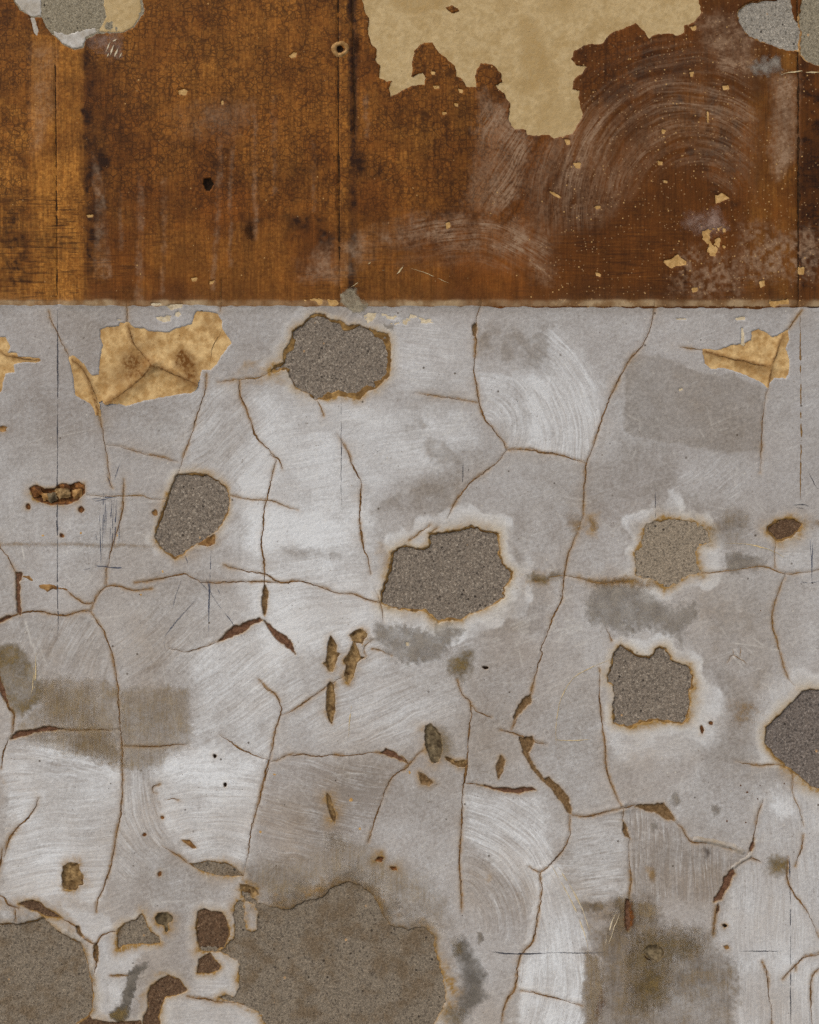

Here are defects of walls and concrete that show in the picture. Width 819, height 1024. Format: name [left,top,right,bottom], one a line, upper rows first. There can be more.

peeling [362,0,701,145]
spalling [271,314,392,400]
spalling [381,525,513,623]
damp [0,646,31,682]
crack [0,372,383,976]
crack [413,303,763,1024]
crack [225,677,418,872]
crack [740,762,816,930]
spalling [0,900,187,1024]
spalling [190,861,446,1024]
damp [586,897,731,1024]
crack [762,955,818,1024]